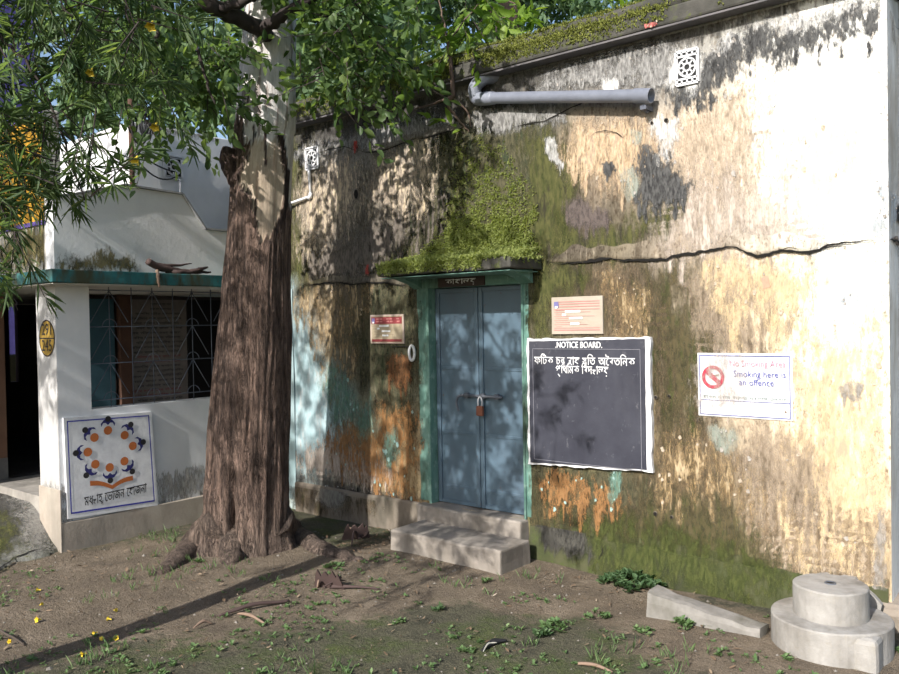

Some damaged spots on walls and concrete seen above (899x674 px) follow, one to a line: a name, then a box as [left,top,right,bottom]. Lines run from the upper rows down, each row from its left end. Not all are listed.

damp [481,0,878,117]
damp [632,142,695,240]
damp [296,90,536,436]
crack [548,239,899,264]
rust [386,353,412,400]
damp [530,257,890,595]